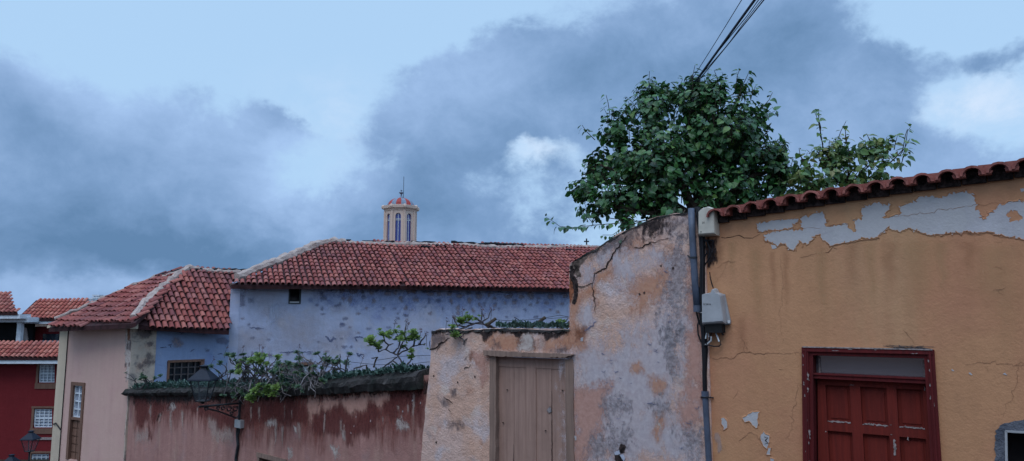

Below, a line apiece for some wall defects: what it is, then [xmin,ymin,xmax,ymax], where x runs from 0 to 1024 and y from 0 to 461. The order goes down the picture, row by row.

peeling [755,188,1024,252]
crack [584,236,668,331]
damp [573,220,704,461]
damp [133,380,428,459]
peeling [742,410,775,461]